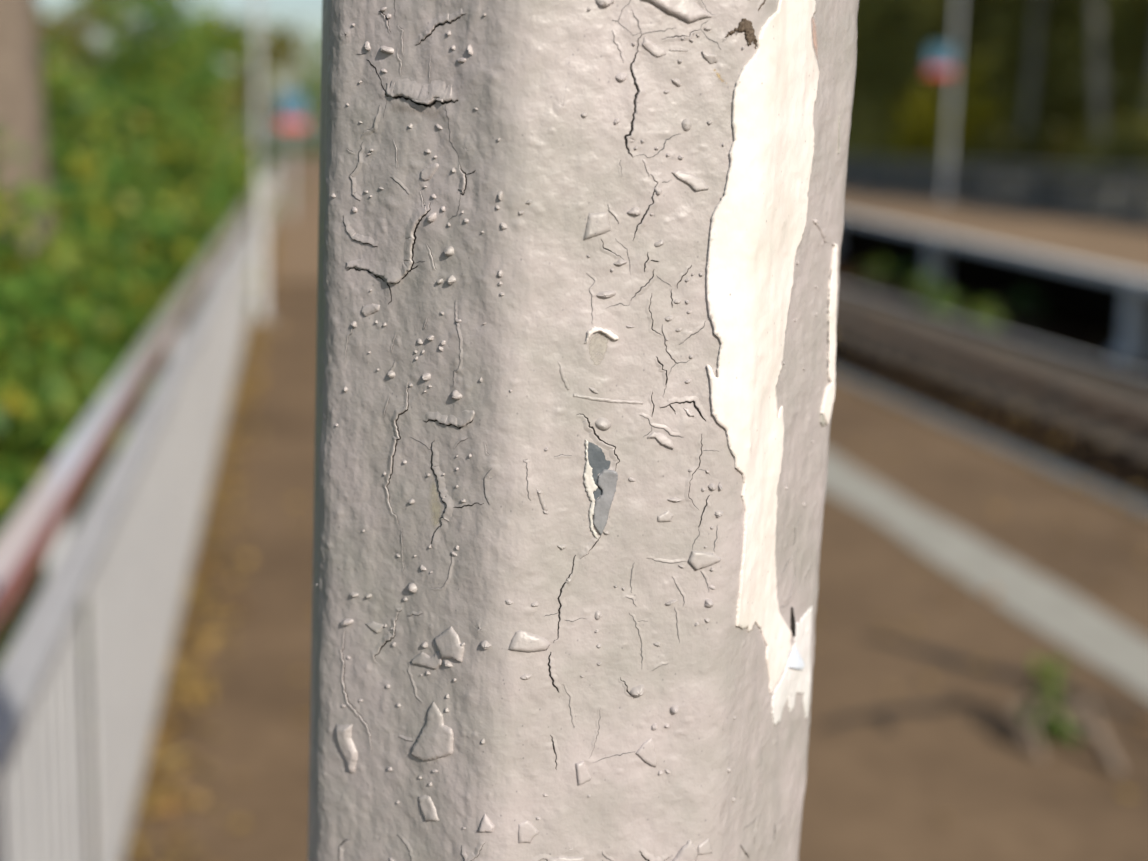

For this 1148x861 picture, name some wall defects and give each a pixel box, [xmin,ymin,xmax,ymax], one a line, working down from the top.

crack [757,0,766,11]
crack [343,0,476,305]
peeling [672,170,709,191]
crack [338,317,496,752]
crack [523,454,572,501]
peeling [583,440,598,539]
crack [577,413,620,471]
peeling [584,326,619,365]
crack [587,0,720,700]
peeling [706,0,820,725]
peeling [820,244,838,427]
crack [545,536,632,770]